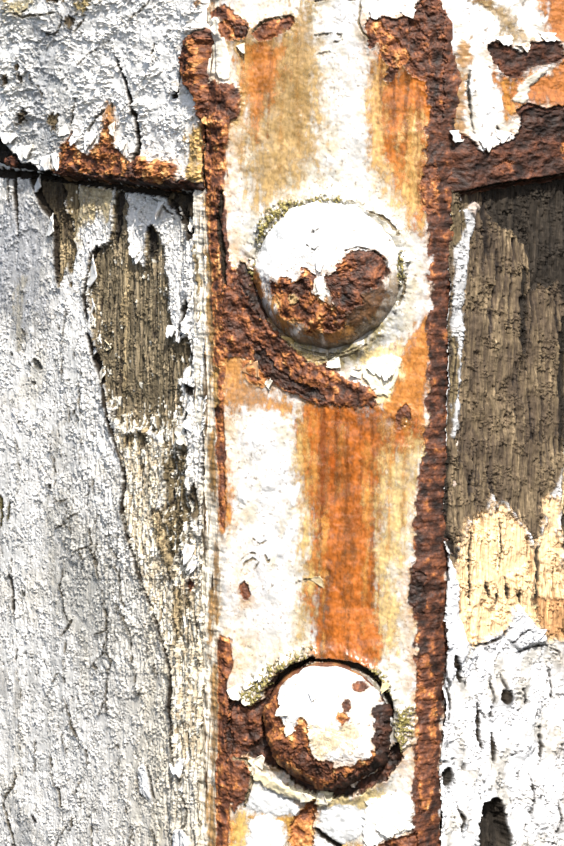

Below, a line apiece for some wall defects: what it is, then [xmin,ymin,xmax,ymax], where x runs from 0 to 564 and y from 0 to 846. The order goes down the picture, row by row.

peeling [1,64,23,87]
crack [0,245,188,846]
peeling [0,108,205,793]
corrosion [206,542,221,644]
corrosion [51,0,430,534]
corrosion [205,635,404,846]
corrosion [294,0,564,846]
peeling [442,178,564,720]